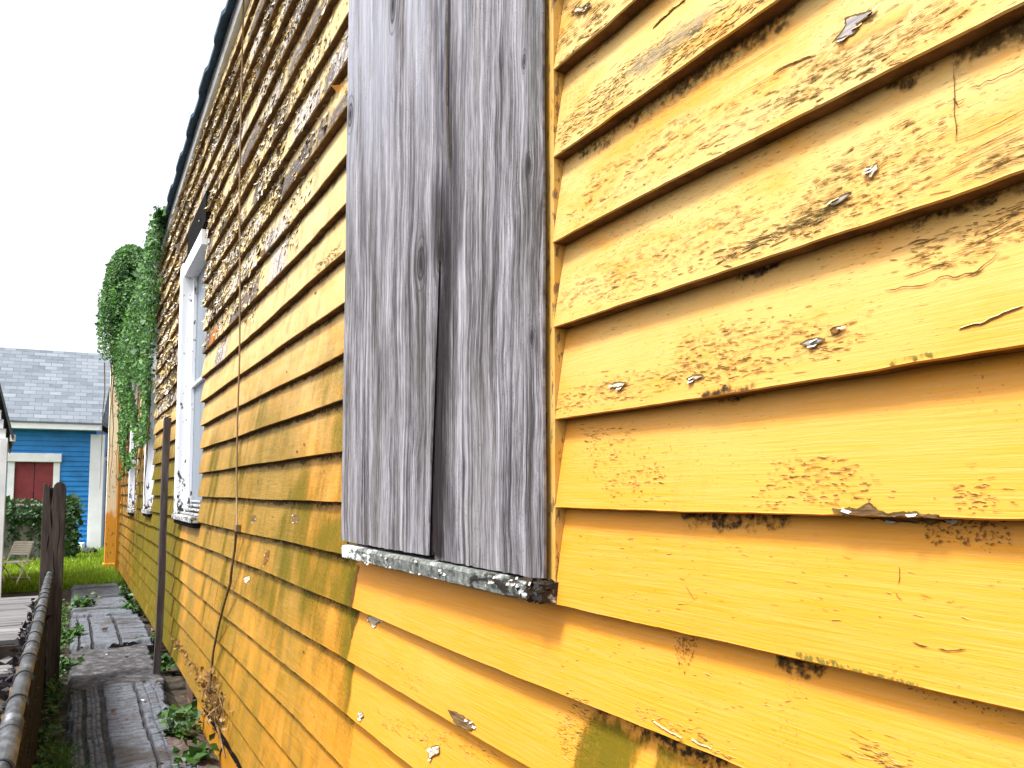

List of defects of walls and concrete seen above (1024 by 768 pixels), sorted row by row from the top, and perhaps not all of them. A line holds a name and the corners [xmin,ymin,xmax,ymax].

peeling [832,6,877,43]
crack [555,0,985,227]
peeling [151,0,348,424]
crack [558,65,1024,311]
leakage [204,309,345,404]
leakage [205,213,346,380]
crack [959,305,1023,329]
leakage [129,358,359,714]
leakage [681,513,789,532]
peeling [832,502,958,525]
peeling [448,710,476,731]
leakage [574,710,727,768]